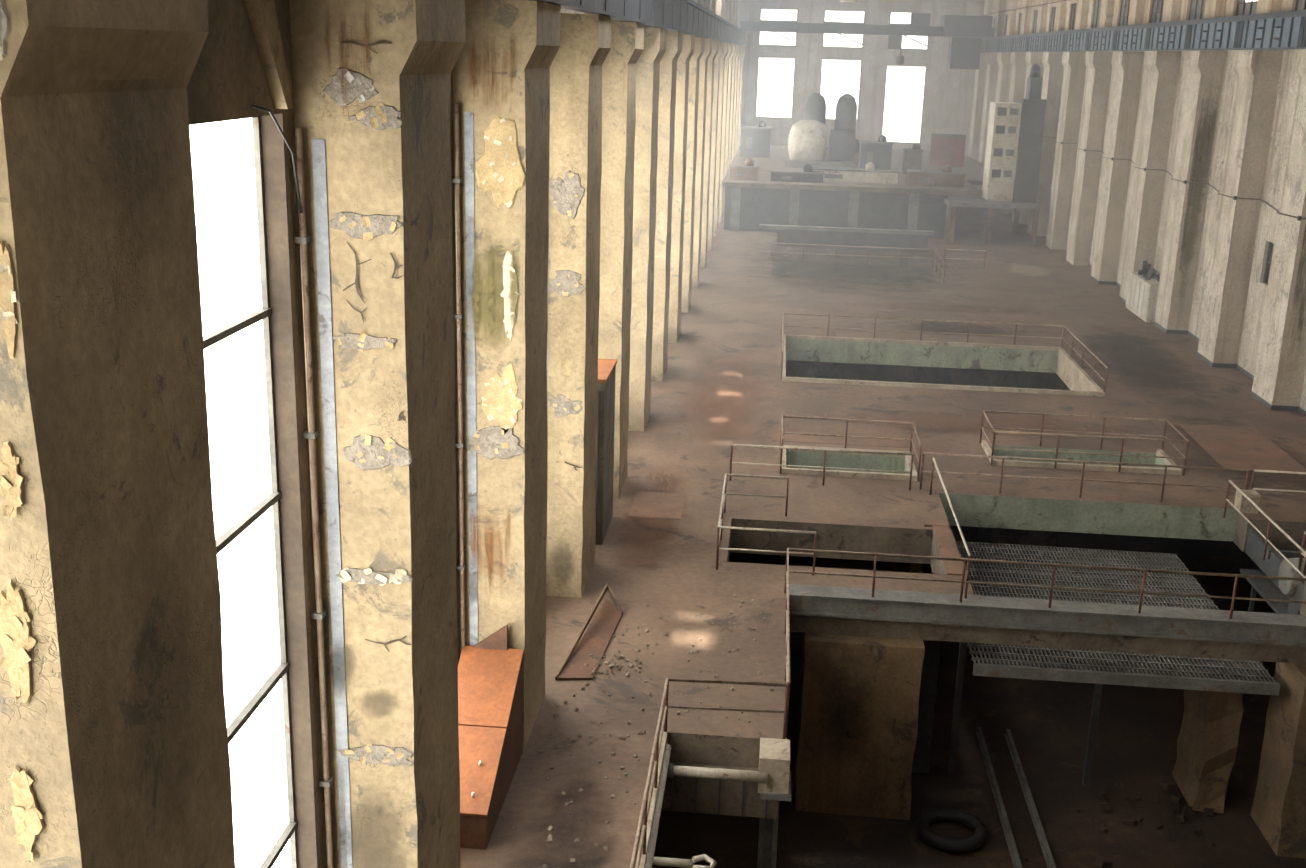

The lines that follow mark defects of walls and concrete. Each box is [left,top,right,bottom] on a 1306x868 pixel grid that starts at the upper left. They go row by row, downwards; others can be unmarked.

crack [340,40,392,54]
peeling [323,67,403,130]
spalling [328,212,403,240]
peeling [476,116,526,208]
spalling [549,170,585,219]
crack [343,242,403,323]
leakage [473,250,518,339]
peeling [0,441,24,518]
spalling [343,434,412,471]
spalling [336,567,413,586]
peeling [0,579,37,706]
peeling [8,765,44,862]